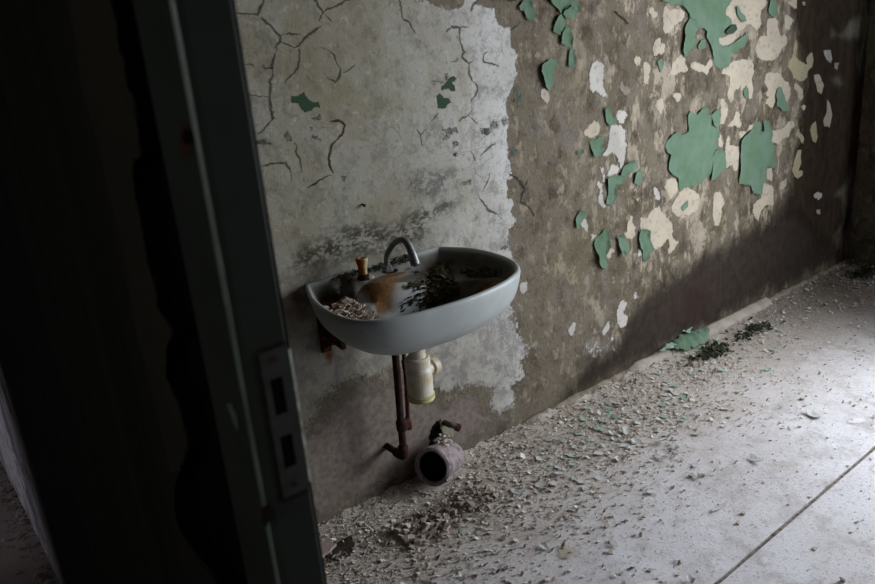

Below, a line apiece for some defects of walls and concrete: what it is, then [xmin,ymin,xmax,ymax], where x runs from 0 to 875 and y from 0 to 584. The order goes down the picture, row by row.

crack [237,0,355,134]
crack [446,1,498,124]
peeling [540,0,581,107]
crack [261,119,346,188]
crack [471,143,534,220]
peeling [576,0,839,269]
peeling [601,292,639,341]